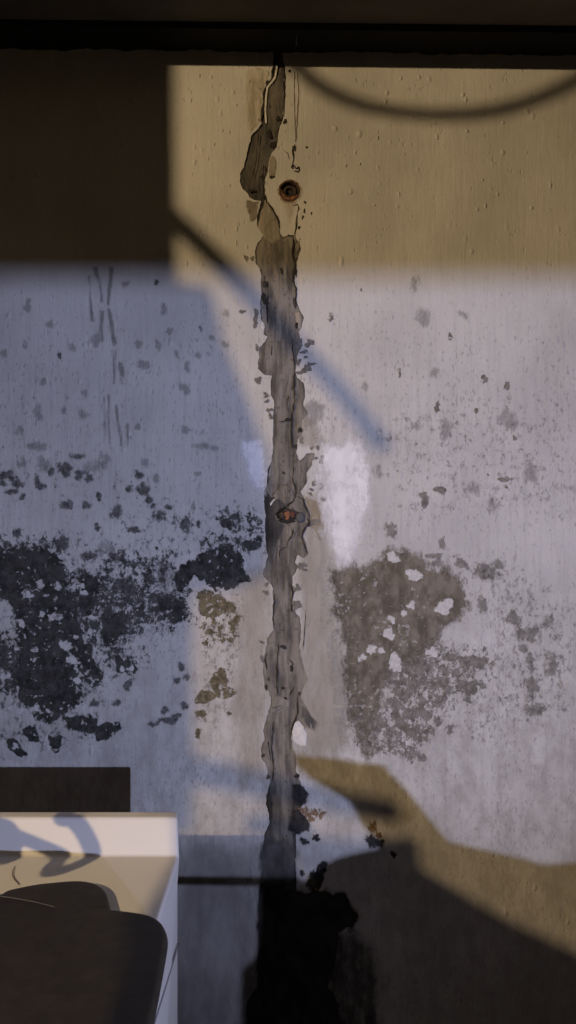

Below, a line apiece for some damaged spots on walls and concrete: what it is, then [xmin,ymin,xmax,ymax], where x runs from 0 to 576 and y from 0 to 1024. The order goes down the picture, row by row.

spalling [240,52,312,243]
leakage [0,453,102,510]
peeling [253,281,268,329]
peeling [254,376,274,419]
spalling [264,471,326,571]
peeling [294,322,316,375]
peeling [286,418,324,464]
leakage [0,470,264,759]
leakage [306,438,504,764]
leakage [506,610,558,716]